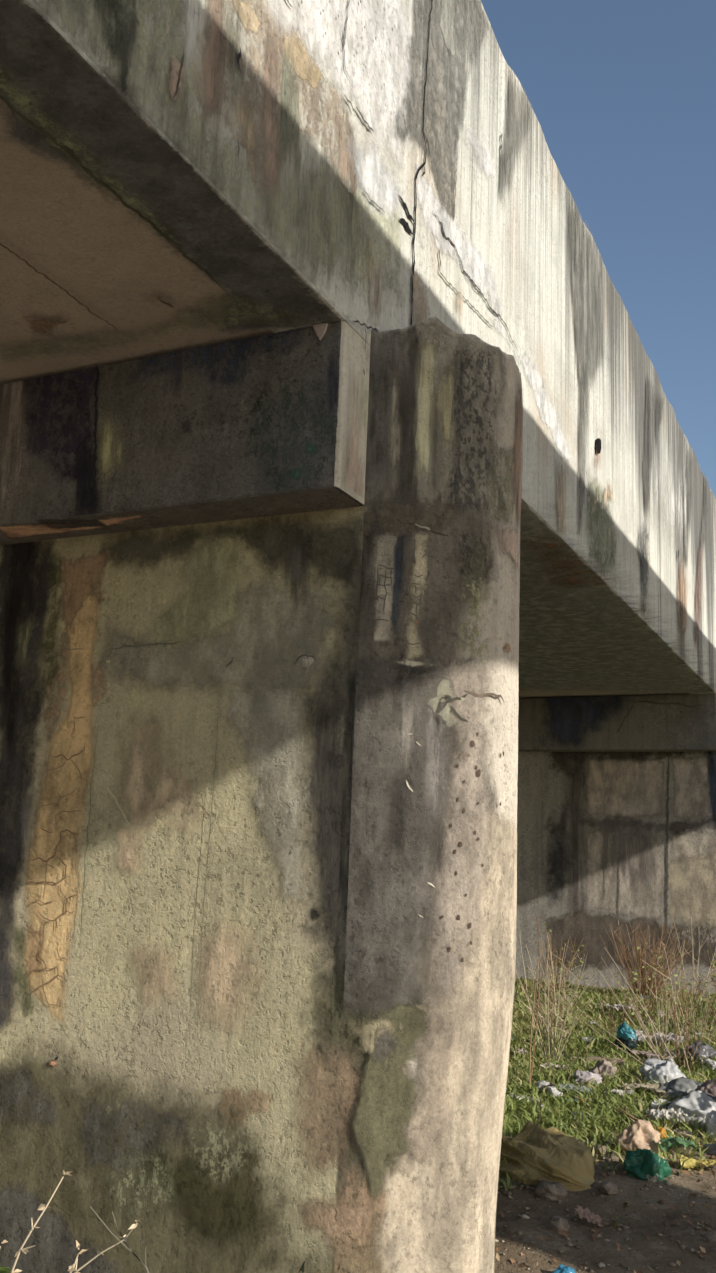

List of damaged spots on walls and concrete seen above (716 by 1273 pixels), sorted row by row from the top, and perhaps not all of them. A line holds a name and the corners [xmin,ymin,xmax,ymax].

water stain [0,0,532,388]
crack [26,703,130,1007]
water stain [0,316,517,1273]
crack [464,690,505,703]
water stain [513,208,716,970]